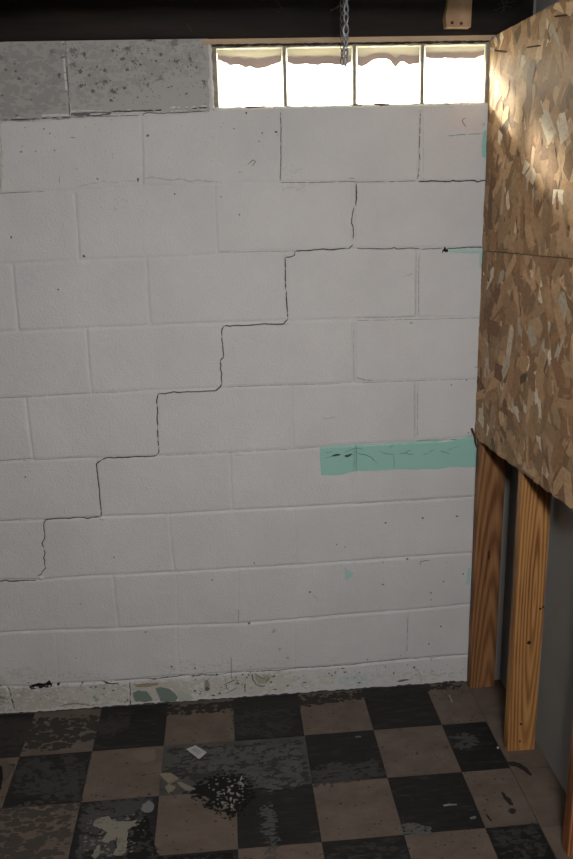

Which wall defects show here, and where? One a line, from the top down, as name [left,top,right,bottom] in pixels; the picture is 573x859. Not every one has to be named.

crack [0,112,485,582]
spalling [29,680,60,689]
peeling [130,678,185,702]